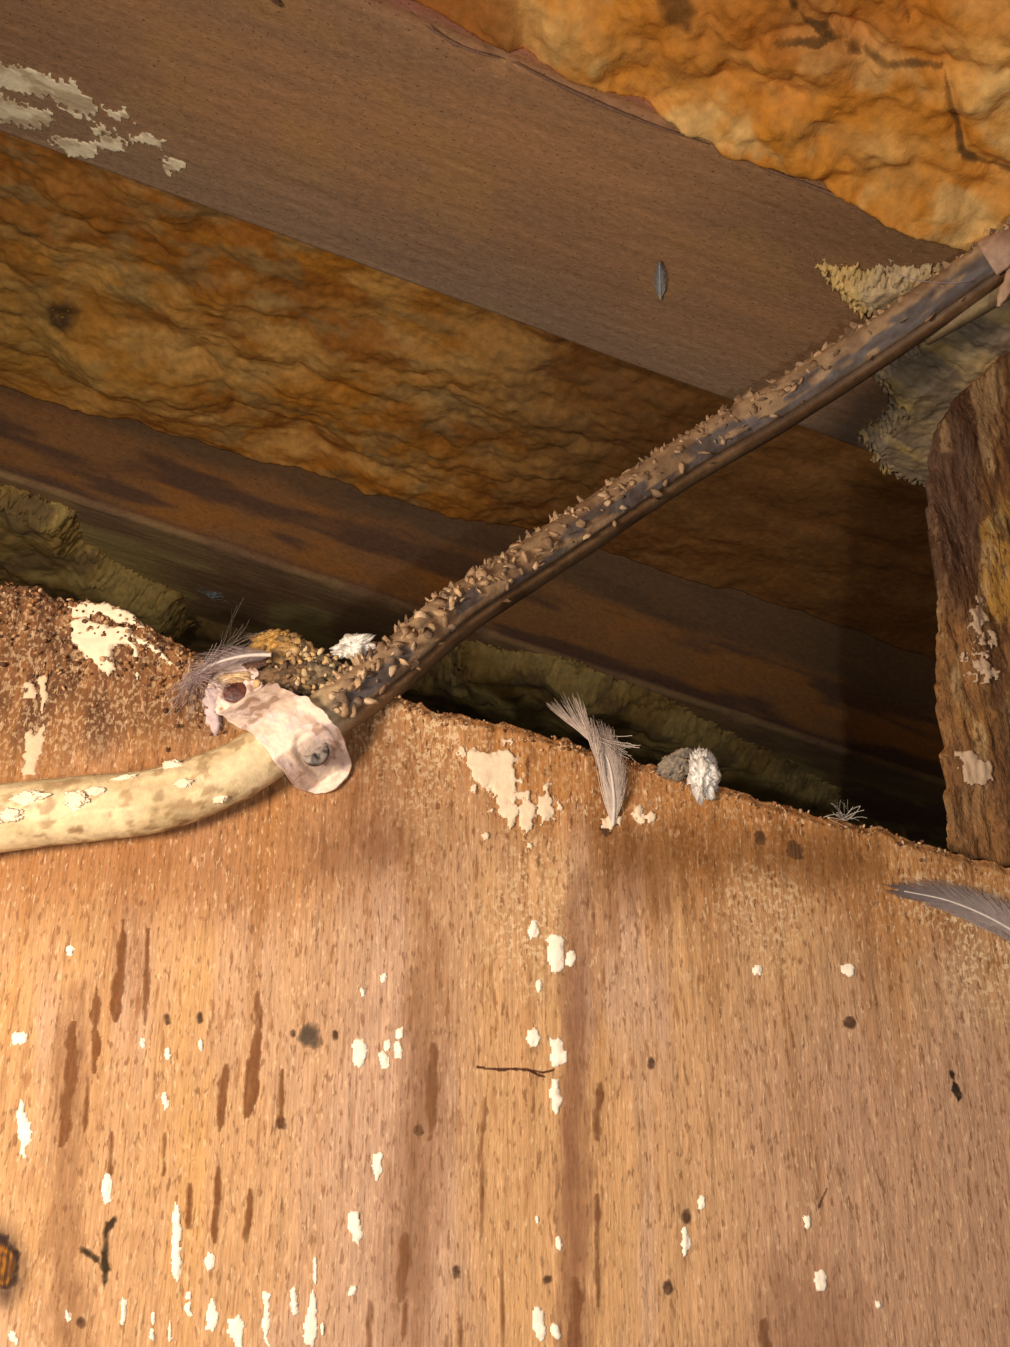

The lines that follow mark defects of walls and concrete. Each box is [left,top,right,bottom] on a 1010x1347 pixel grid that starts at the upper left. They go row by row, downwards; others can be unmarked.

peeling [0,61,186,177]
peeling [68,600,173,680]
peeling [959,595,1000,684]
peeling [455,737,563,850]
peeling [601,804,658,830]
leakage [755,831,765,845]
leakage [787,840,803,859]
peeling [954,750,994,786]
leakage [844,1017,856,1028]
crack [476,1066,554,1078]
peeling [171,1202,272,1347]
peeling [290,1257,325,1347]